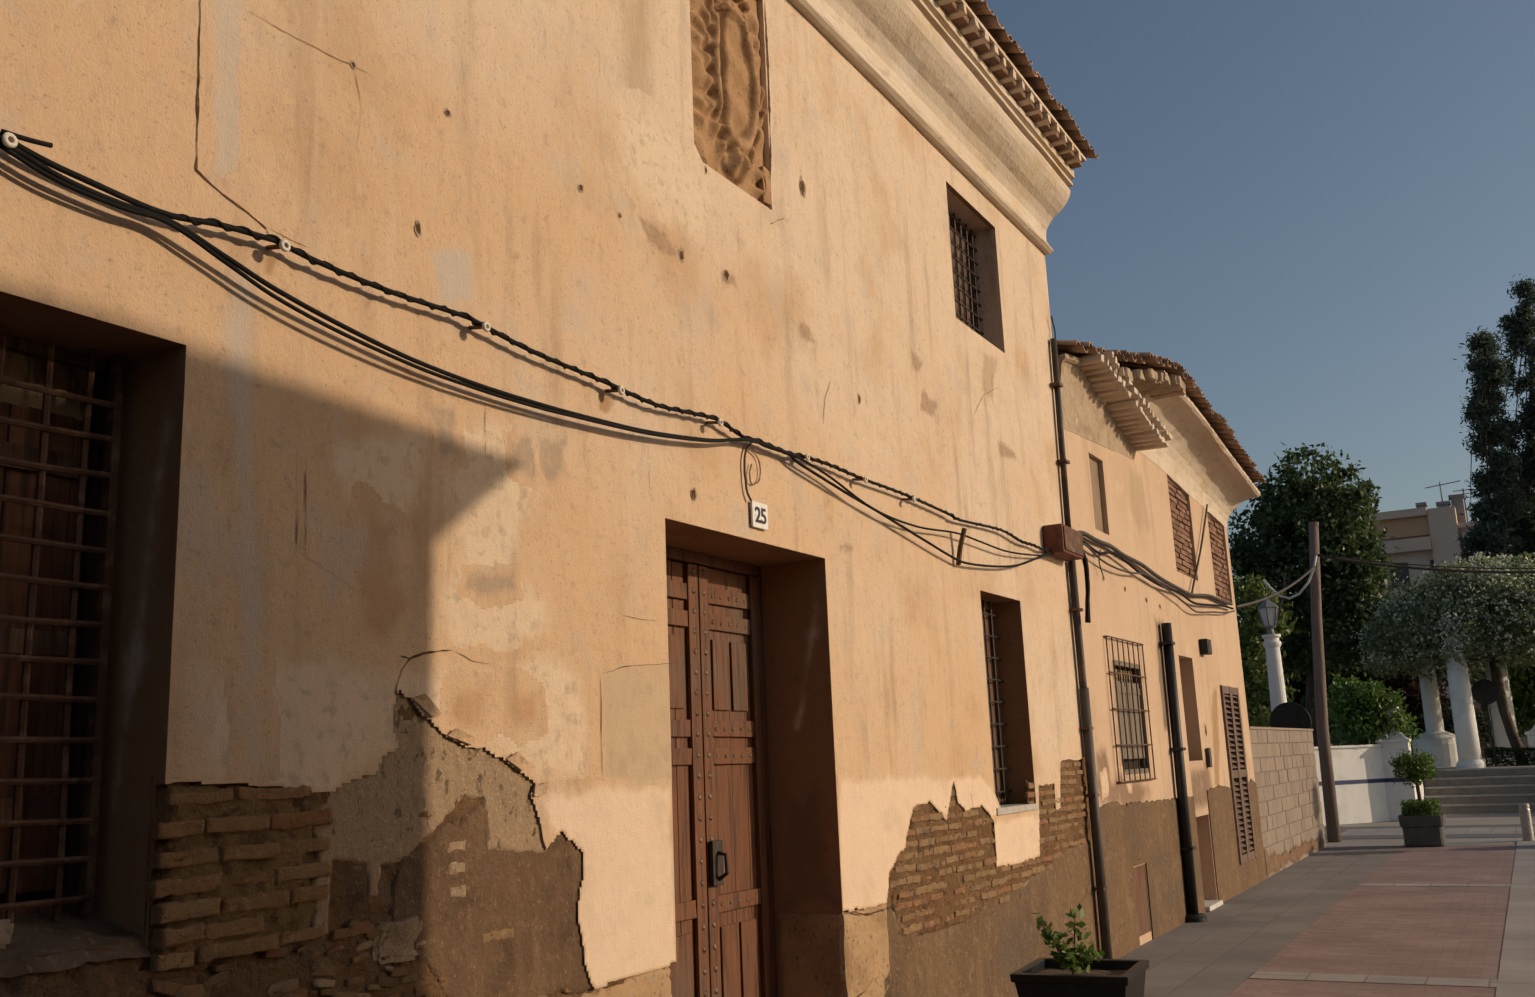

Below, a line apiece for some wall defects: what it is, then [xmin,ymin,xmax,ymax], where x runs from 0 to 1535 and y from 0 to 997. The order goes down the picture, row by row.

crack [195,0,307,247]
flaking render [143,692,672,997]
flaking render [889,759,1132,937]